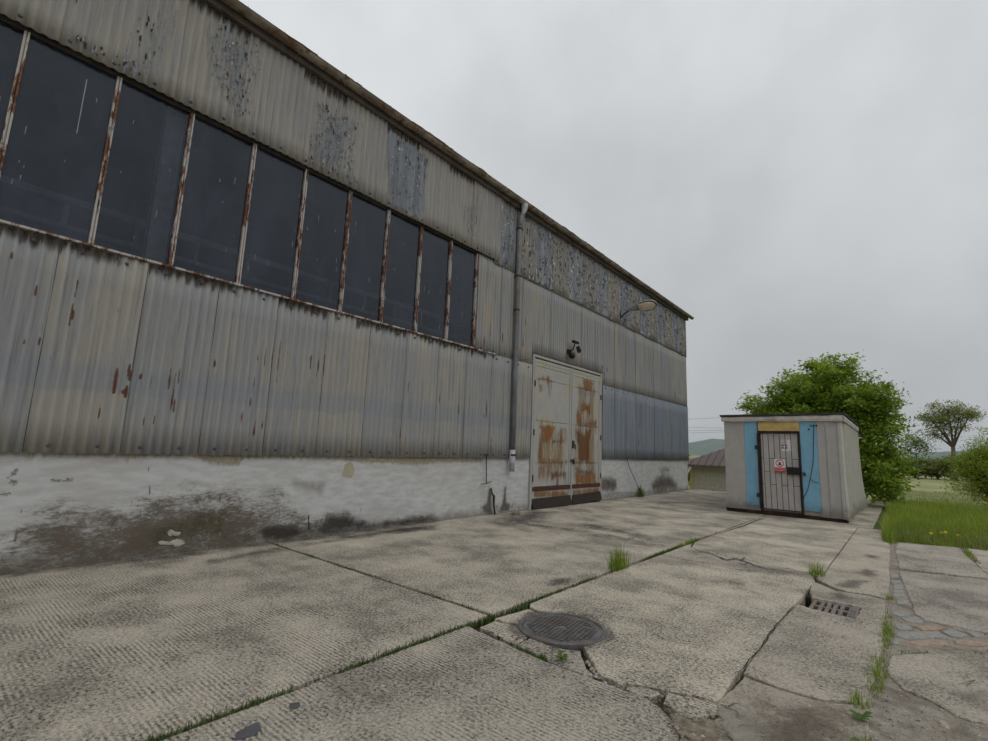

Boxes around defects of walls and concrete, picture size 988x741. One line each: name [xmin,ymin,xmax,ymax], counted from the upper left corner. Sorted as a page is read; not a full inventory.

peeling [207,17,262,118]
peeling [388,130,428,221]
peeling [499,200,687,356]
corrosion [112,364,142,398]
corrosion [534,379,599,498]
water stain [0,492,432,575]
crack [691,517,788,572]